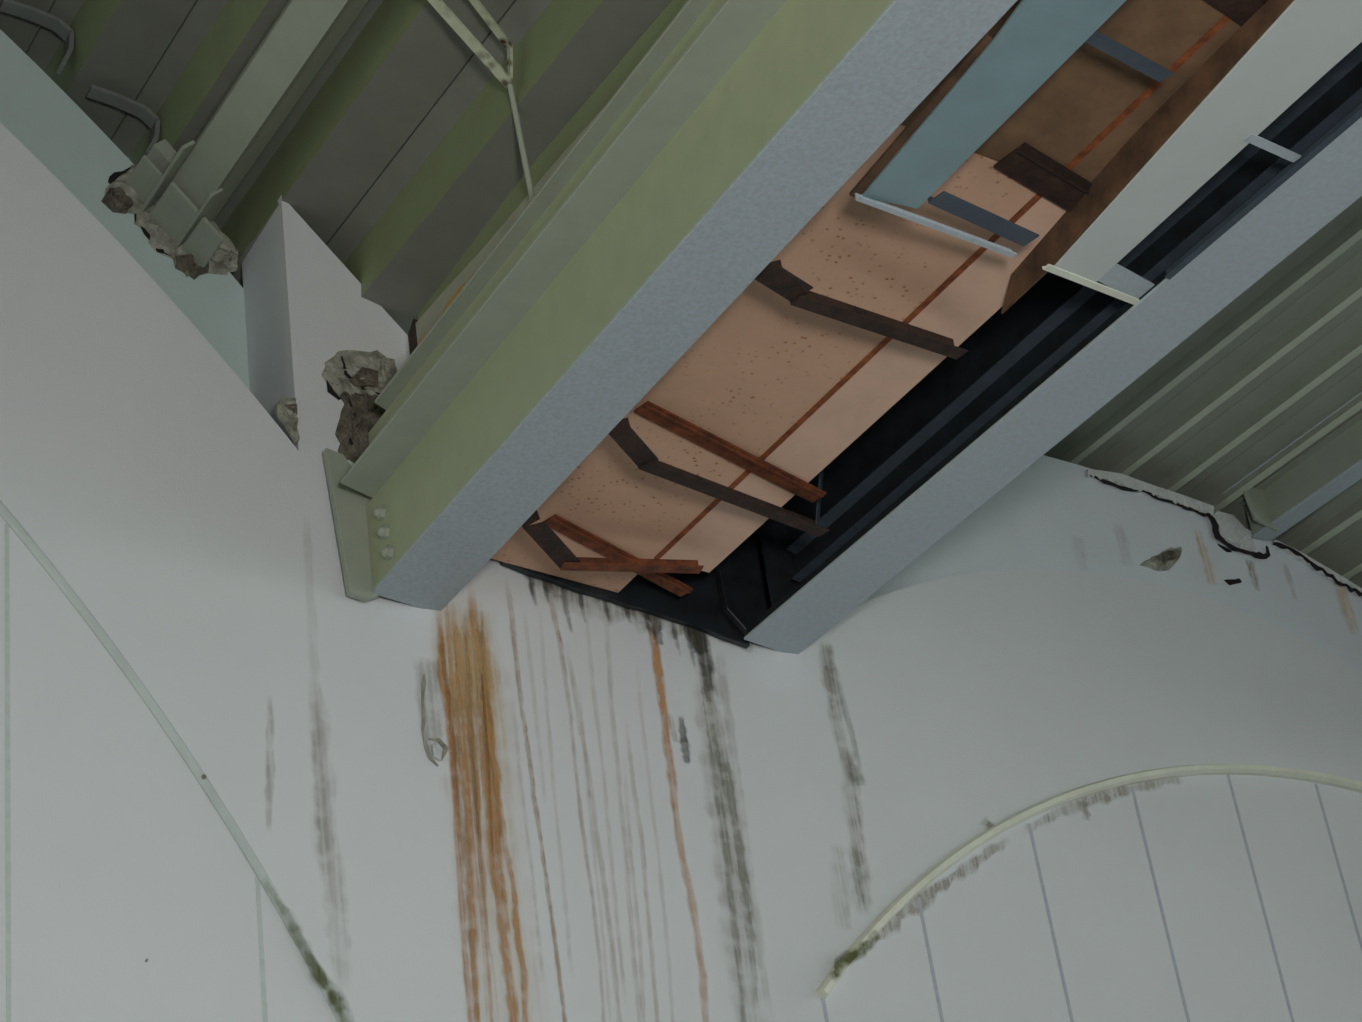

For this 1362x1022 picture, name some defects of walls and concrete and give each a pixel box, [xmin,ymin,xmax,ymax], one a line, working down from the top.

spalling [101,165,238,280]
spalling [321,350,397,463]
spalling [1139,546,1182,571]
crack [1090,475,1362,596]
corrosion [650,617,671,752]
water stain [689,629,713,695]
corrosion [438,613,526,1022]
water stain [710,737,751,923]
corrosion [551,911,566,1022]